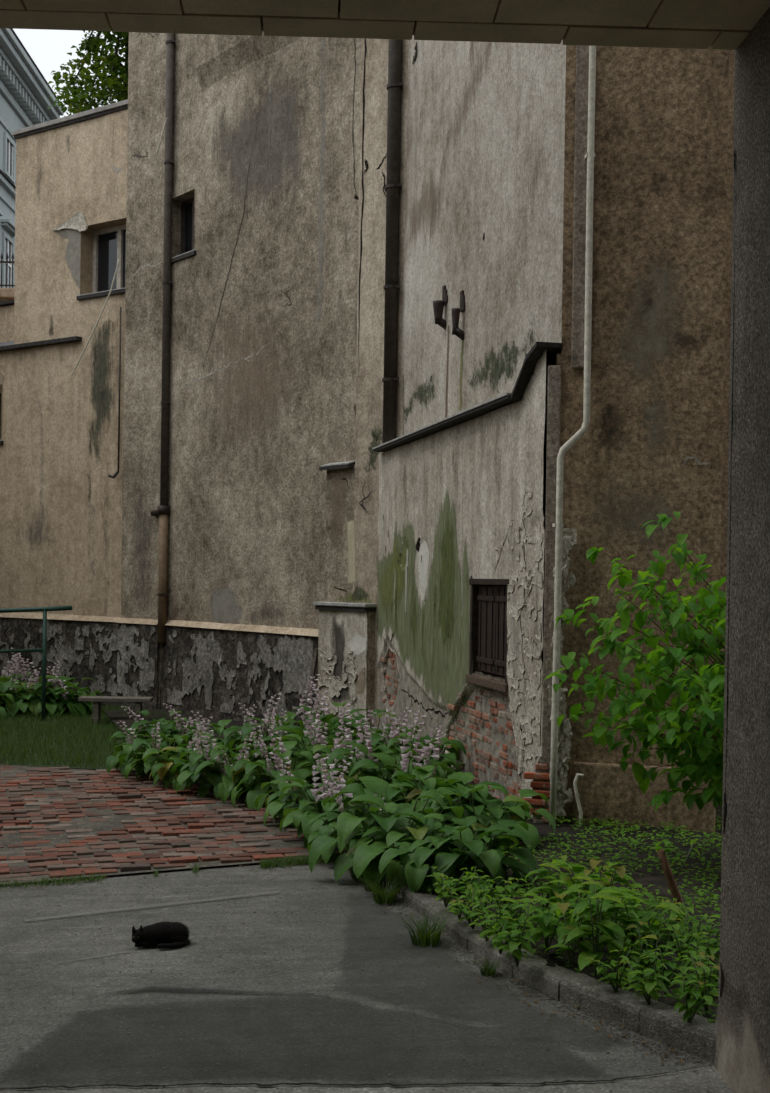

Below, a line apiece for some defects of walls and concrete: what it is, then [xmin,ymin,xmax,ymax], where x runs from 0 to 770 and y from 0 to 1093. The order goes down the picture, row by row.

crack [197,83,263,390]
crack [352,38,387,377]
leakage [89,323,114,460]
peeling [0,619,155,697]
peeling [167,491,577,823]
leakage [380,519,467,668]